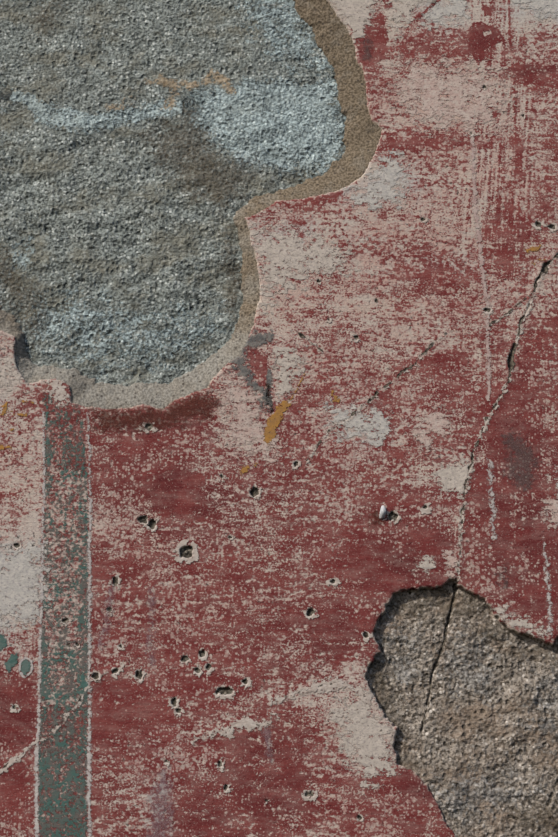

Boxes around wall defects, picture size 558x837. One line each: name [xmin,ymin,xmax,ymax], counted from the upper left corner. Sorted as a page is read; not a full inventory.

peeling [385,49,525,141]
flaking render [0,0,472,469]
crack [306,332,447,464]
crack [420,253,558,732]
spalling [172,539,199,564]
spalling [303,606,319,619]
spalling [180,648,214,677]
spalling [168,697,185,717]
spalling [213,677,252,700]
flaking render [328,550,558,837]
spalling [301,790,318,801]